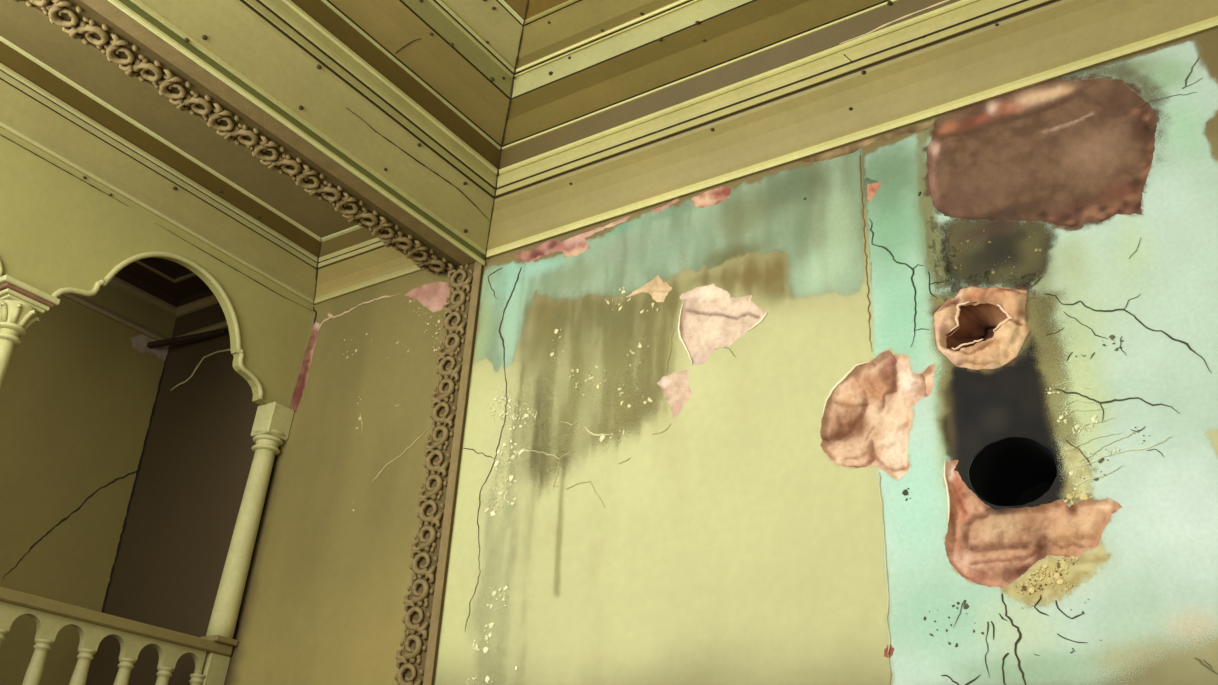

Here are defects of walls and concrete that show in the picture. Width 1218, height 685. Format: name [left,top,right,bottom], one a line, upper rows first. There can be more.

crack [4,356,167,613]
flaking render [290,281,450,412]
flaking render [514,216,629,262]
damp [464,243,812,685]
flaking render [550,275,768,419]
crack [859,155,948,346]
flaking render [820,256,1037,685]
flaking render [795,71,1162,270]
flaking render [942,381,1170,614]
crack [1055,389,1176,456]
crack [1030,276,1210,371]
crack [941,594,1087,685]